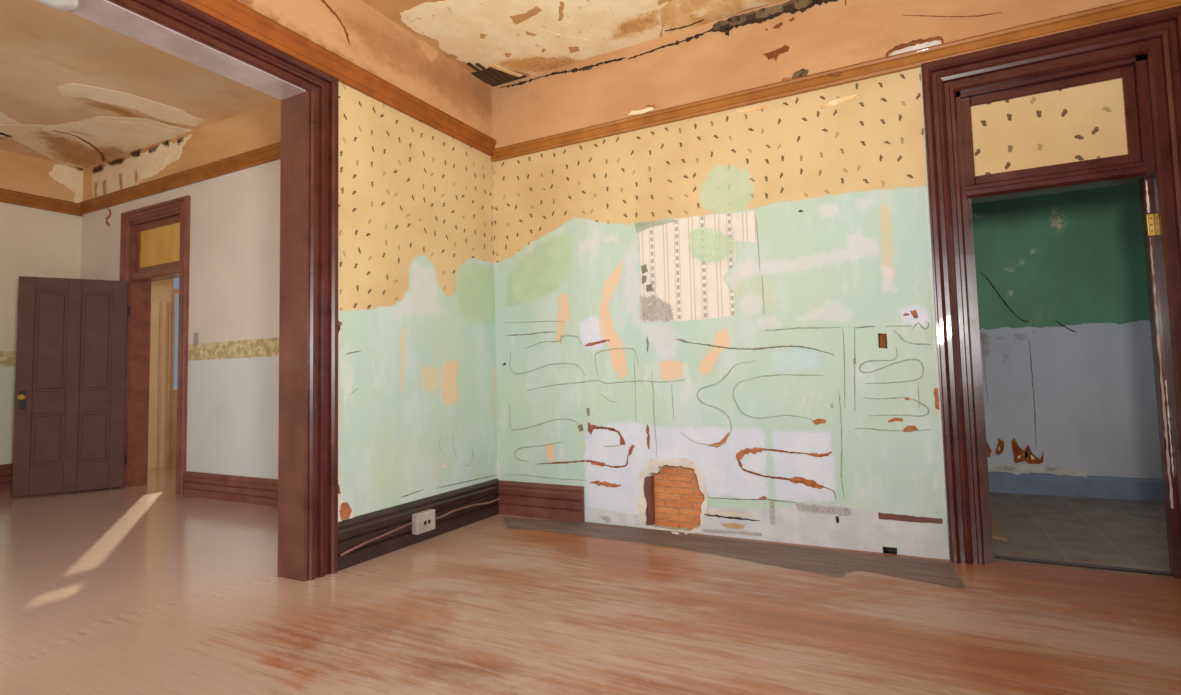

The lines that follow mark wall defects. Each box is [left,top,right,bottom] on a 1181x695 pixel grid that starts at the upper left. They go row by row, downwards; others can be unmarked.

peeling [400,0,783,75]
peeling [763,44,789,61]
spalling [886,36,944,57]
crack [907,10,1002,18]
peeling [0,83,203,203]
peeling [697,163,757,214]
peeling [577,313,607,351]
peeling [583,191,950,560]
spalling [338,318,355,522]